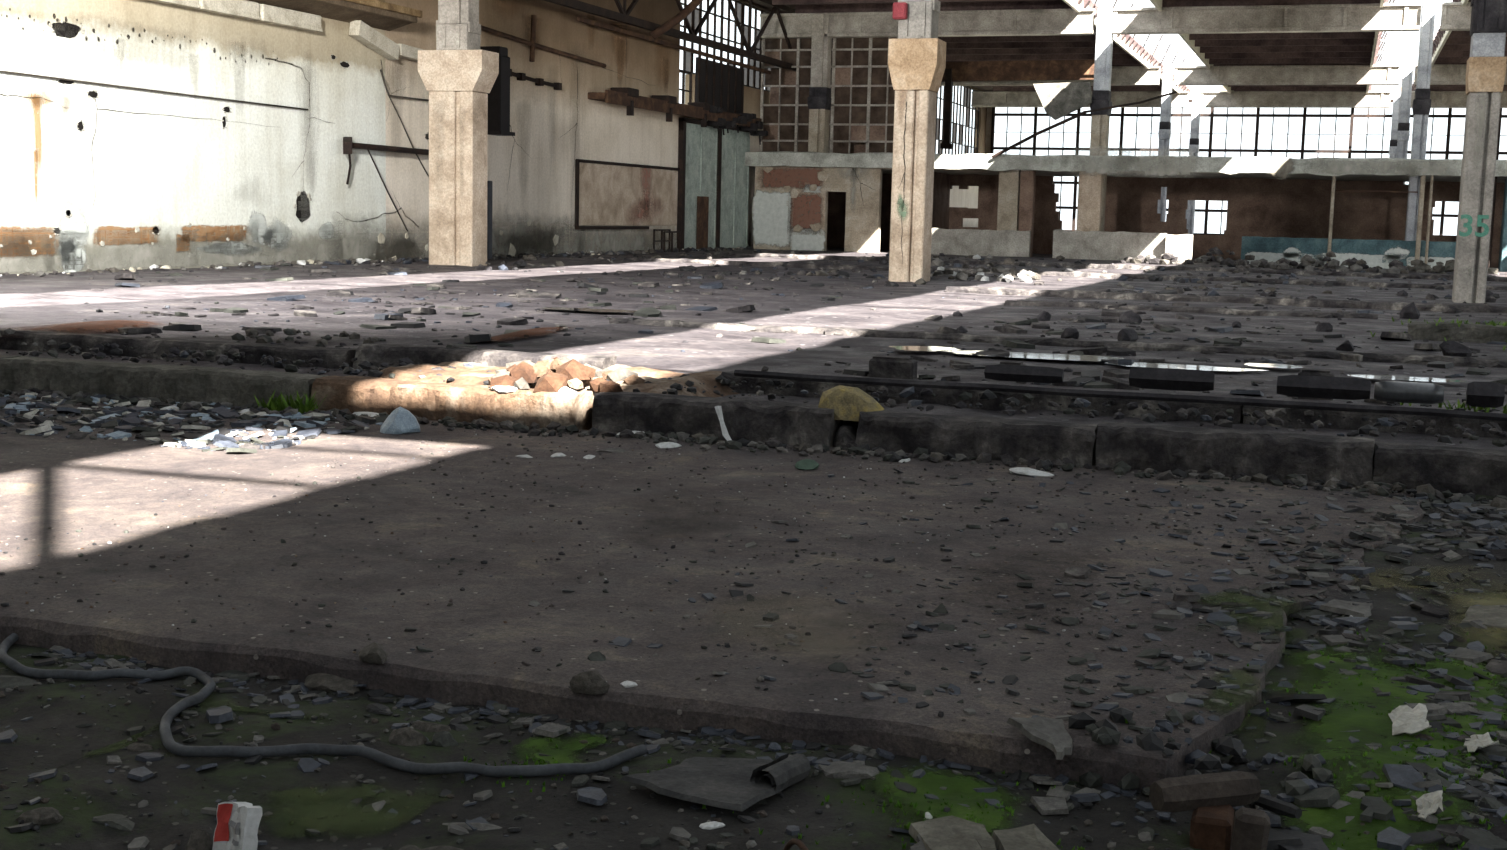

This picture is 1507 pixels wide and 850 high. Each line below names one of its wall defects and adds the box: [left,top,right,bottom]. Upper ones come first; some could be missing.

corrosion [28,94,47,197]
flaking render [0,191,334,272]
flaking render [752,167,829,251]